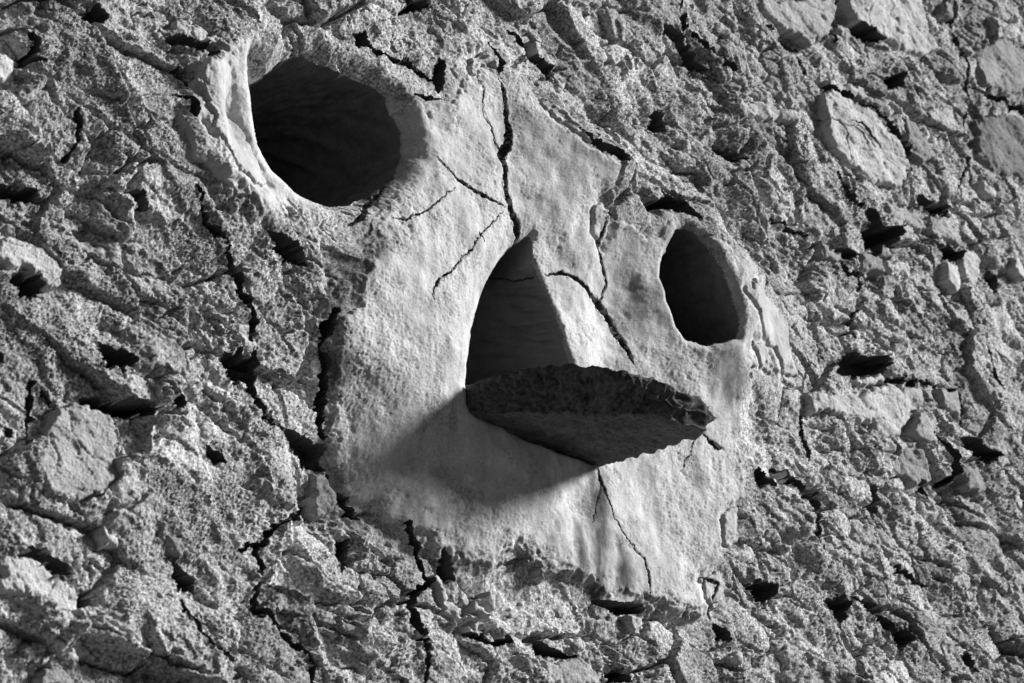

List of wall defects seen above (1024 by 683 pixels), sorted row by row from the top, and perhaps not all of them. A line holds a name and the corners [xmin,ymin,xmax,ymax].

crack [347,30,545,301]
crack [488,211,634,365]
crack [309,307,360,521]
crack [237,504,318,683]
crack [397,519,437,683]
crack [592,467,651,593]